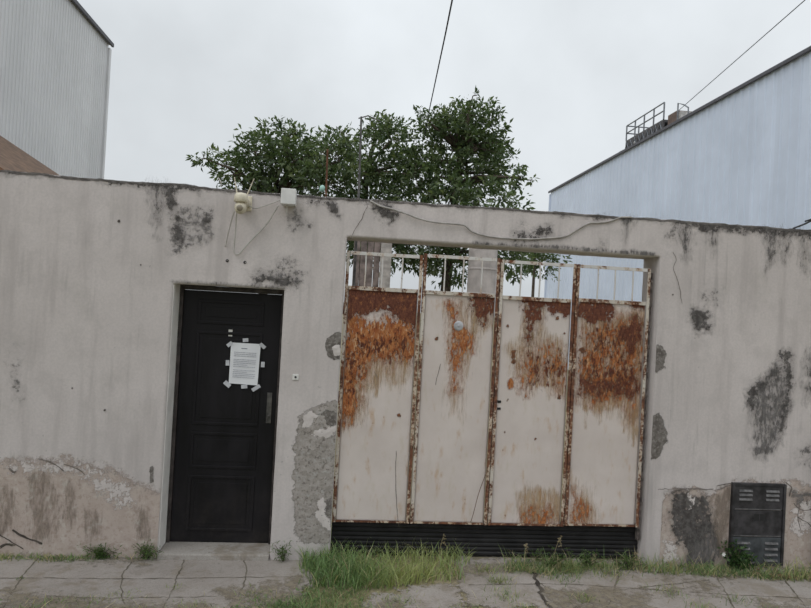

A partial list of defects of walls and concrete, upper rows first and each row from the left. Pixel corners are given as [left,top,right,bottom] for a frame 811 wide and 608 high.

damp [0,170,281,252]
damp [297,195,811,267]
rust [342,289,417,428]
rust [434,297,494,393]
rust [507,300,645,443]
damp [690,295,718,334]
damp [747,350,796,456]
crack [0,529,42,549]
peeling [0,454,160,558]
spalling [292,400,338,546]
peeling [659,479,757,566]
peeling [767,479,811,567]